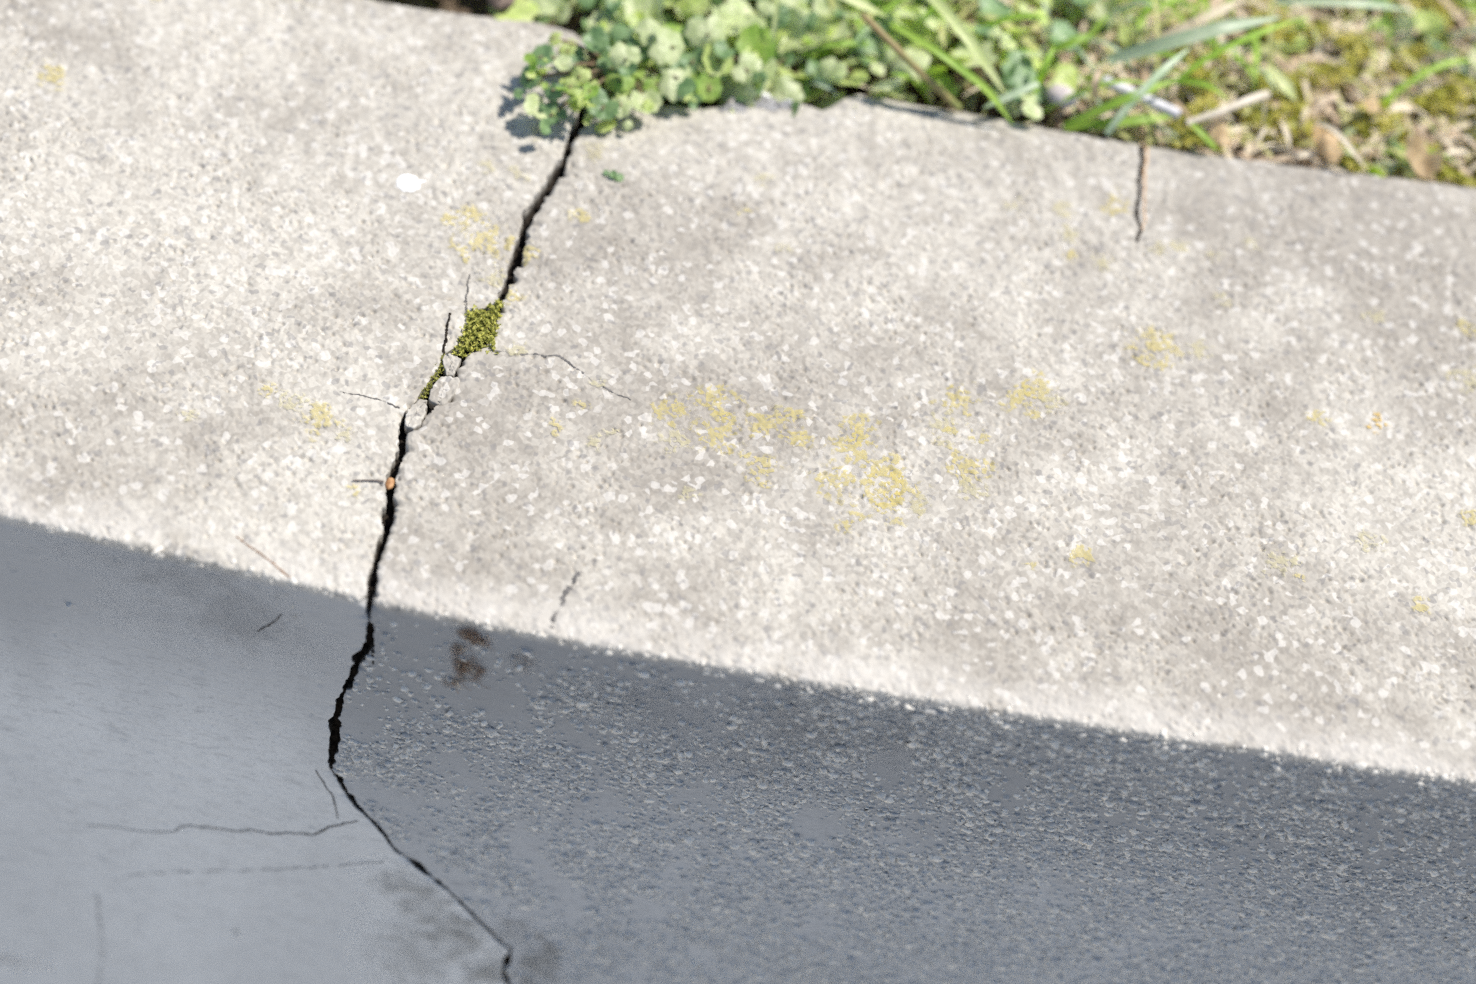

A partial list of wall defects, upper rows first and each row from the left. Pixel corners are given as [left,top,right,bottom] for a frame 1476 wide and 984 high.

crack [1134,145,1149,242]
crack [87,51,631,877]
crack [503,947,512,978]